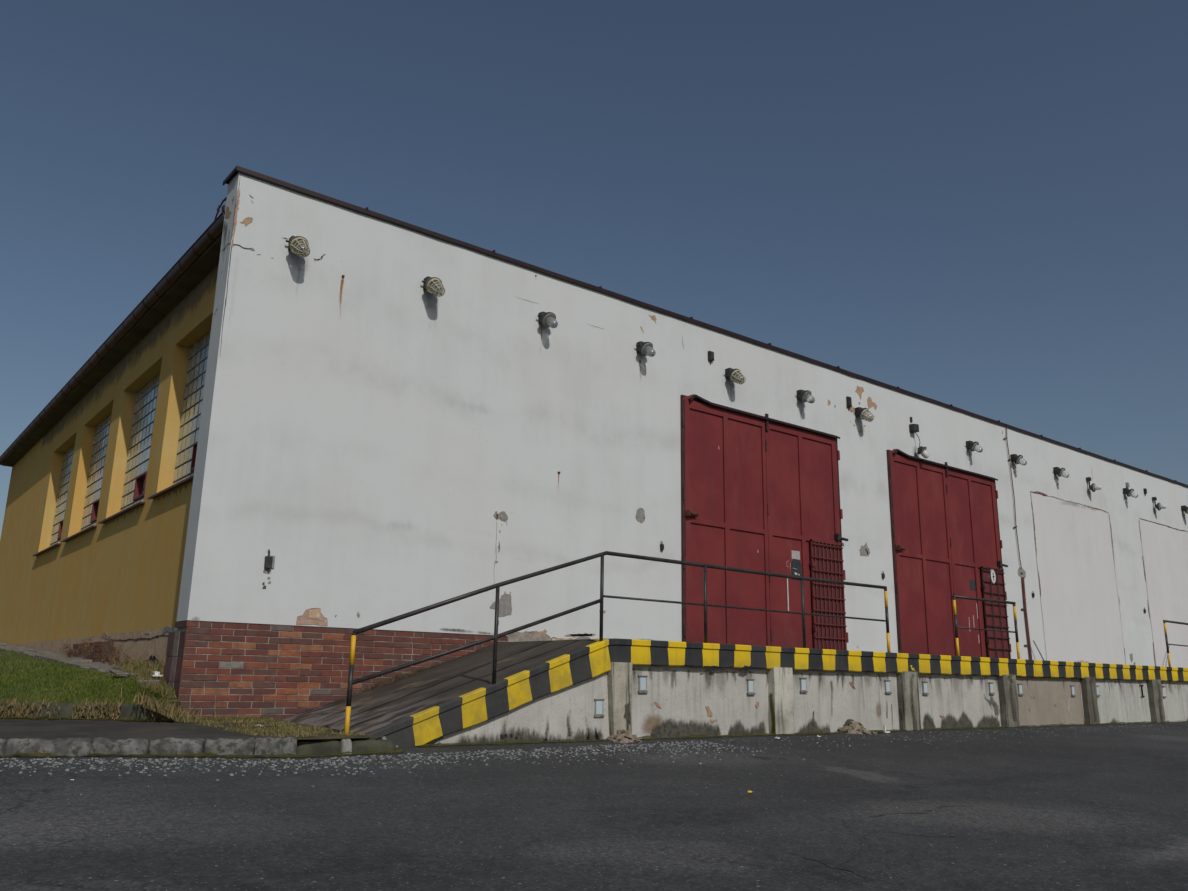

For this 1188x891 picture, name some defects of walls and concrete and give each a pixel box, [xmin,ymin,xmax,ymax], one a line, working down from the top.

peeling [225,189,253,247]
crack [214,237,260,353]
peeling [828,386,877,427]
flaking render [296,608,328,626]
damp [923,678,1001,730]
damp [458,725,555,745]
damp [567,717,602,741]
damp [646,717,765,738]
damp [800,711,830,733]